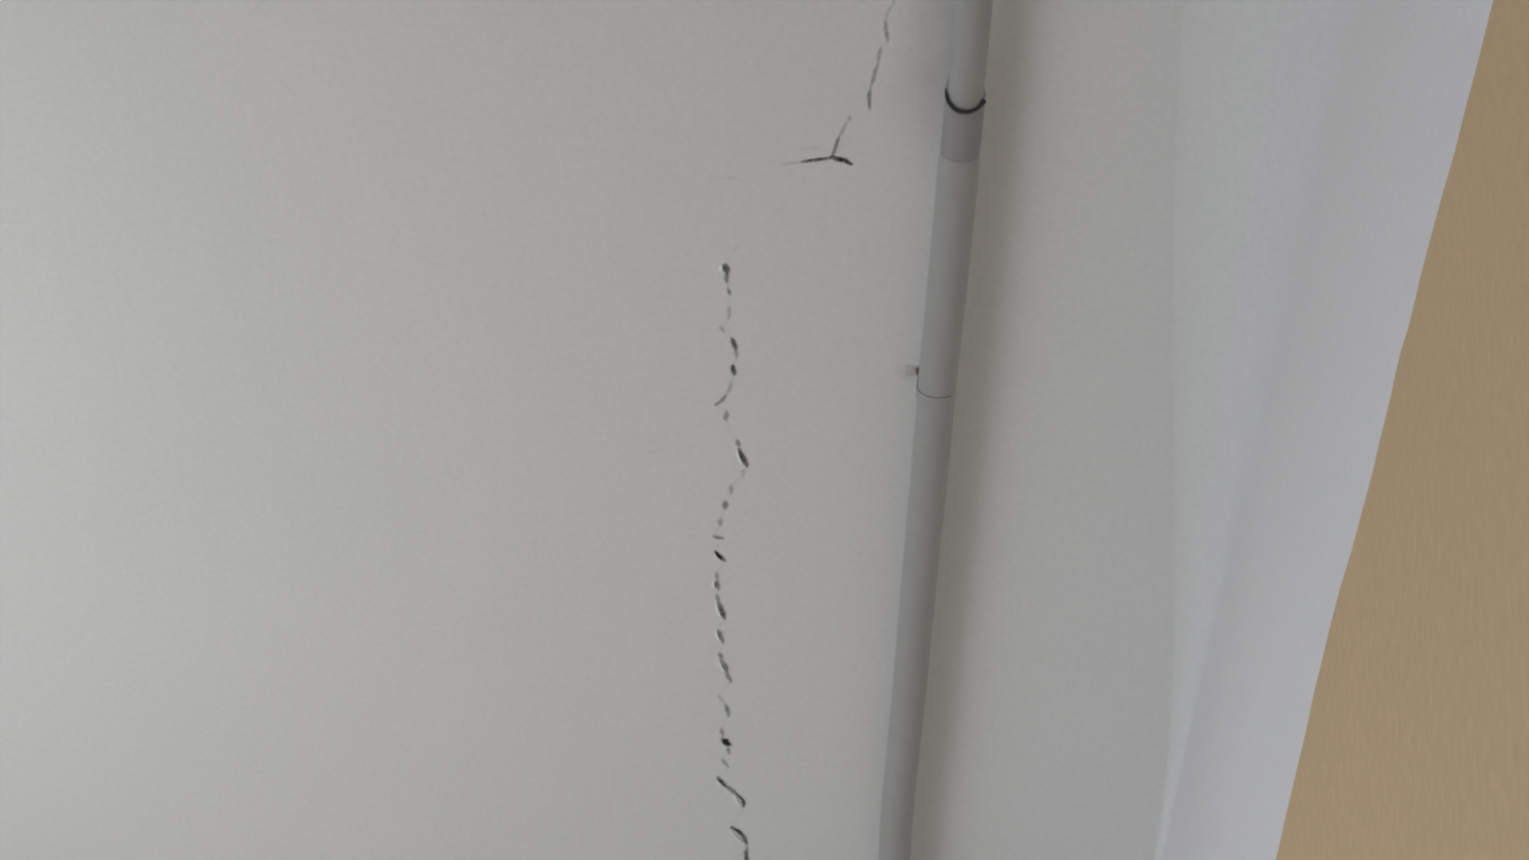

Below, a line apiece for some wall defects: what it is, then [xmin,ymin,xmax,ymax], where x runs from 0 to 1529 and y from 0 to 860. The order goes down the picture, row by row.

crack [805,157,852,165]
crack [736,450,748,466]
crack [711,552,725,672]
crack [715,739,749,860]